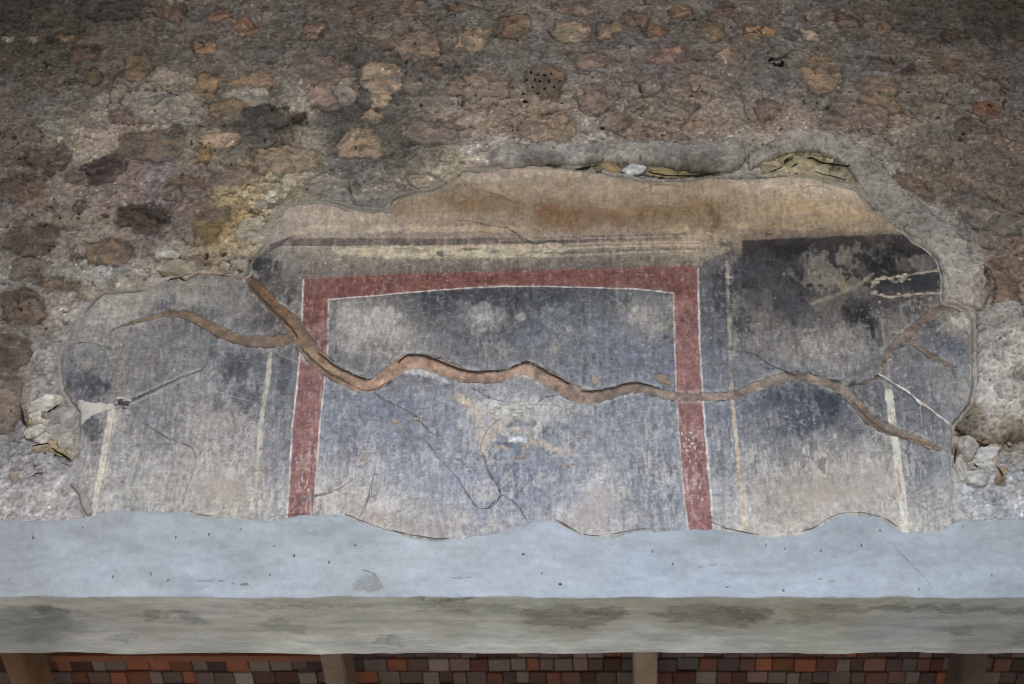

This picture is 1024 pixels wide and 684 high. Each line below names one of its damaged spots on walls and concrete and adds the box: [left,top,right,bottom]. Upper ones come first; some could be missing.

spalling [760,152,857,183]
crack [70,235,960,521]
spalling [20,388,81,466]
spalling [952,430,1014,488]
crack [271,473,449,540]
crack [554,519,650,536]
crack [707,520,759,535]
crack [800,512,932,588]